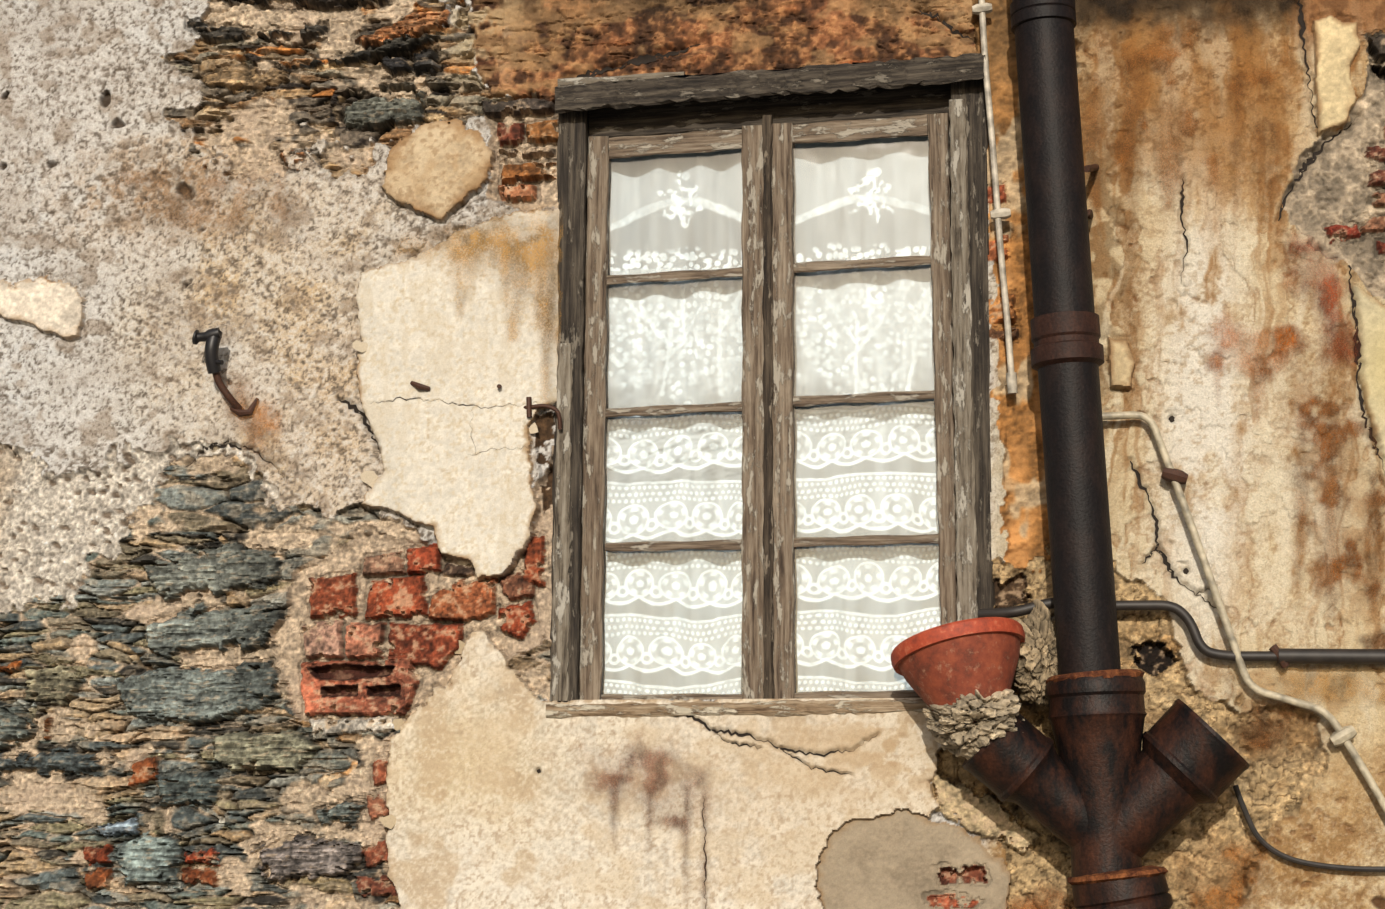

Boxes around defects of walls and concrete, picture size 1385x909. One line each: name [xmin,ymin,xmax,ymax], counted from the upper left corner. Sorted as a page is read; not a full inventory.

spalling [1282,15,1385,298]
rust [1292,270,1355,362]
rust [1263,325,1304,376]
crack [339,397,537,456]
spalling [0,0,1076,909]
rust [1045,669,1145,684]
crack [686,715,876,775]
spalling [1113,560,1331,909]
water stain [599,750,668,810]
rust [1067,865,1168,885]
rust [1192,848,1262,909]